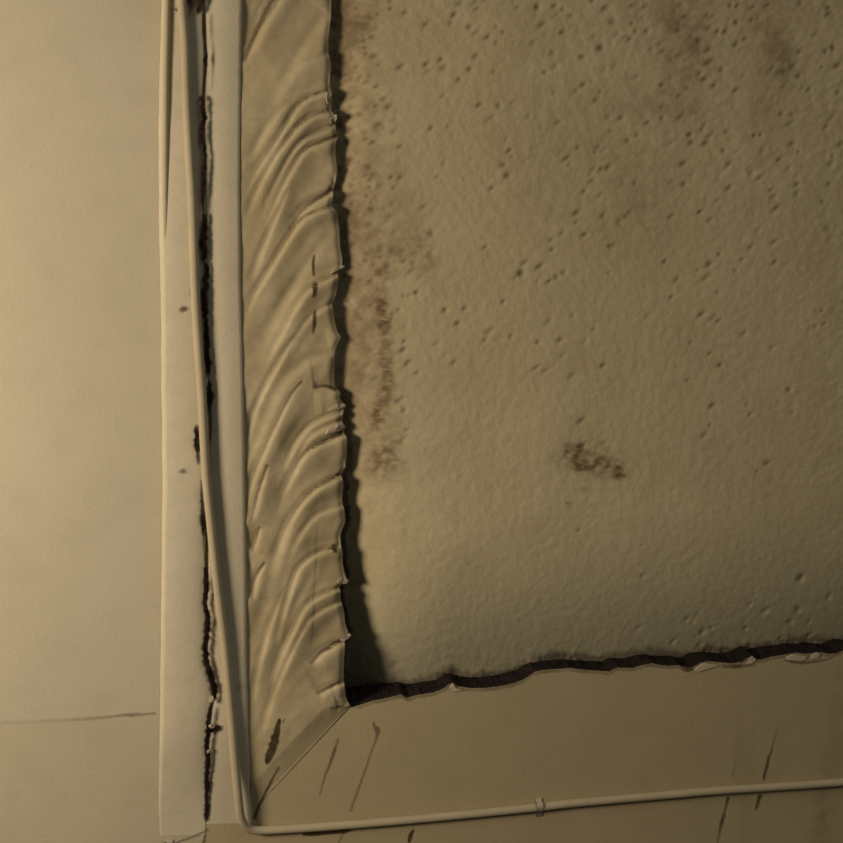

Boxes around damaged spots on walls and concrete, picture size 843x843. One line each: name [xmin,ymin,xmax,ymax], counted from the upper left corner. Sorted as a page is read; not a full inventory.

crack [193,0,215,544]
crack [201,567,220,843]
crack [254,719,280,818]
crack [756,757,769,806]